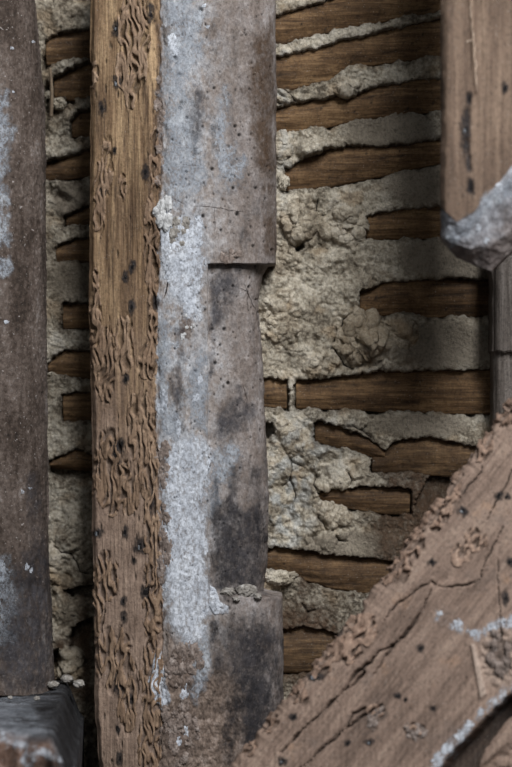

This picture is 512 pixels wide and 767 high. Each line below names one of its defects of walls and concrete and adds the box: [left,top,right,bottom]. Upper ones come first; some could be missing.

water stain [211,274,236,326]
water stain [218,405,253,436]
water stain [211,472,268,598]
crack [285,471,512,750]
water stain [227,605,343,743]
crack [302,709,373,767]